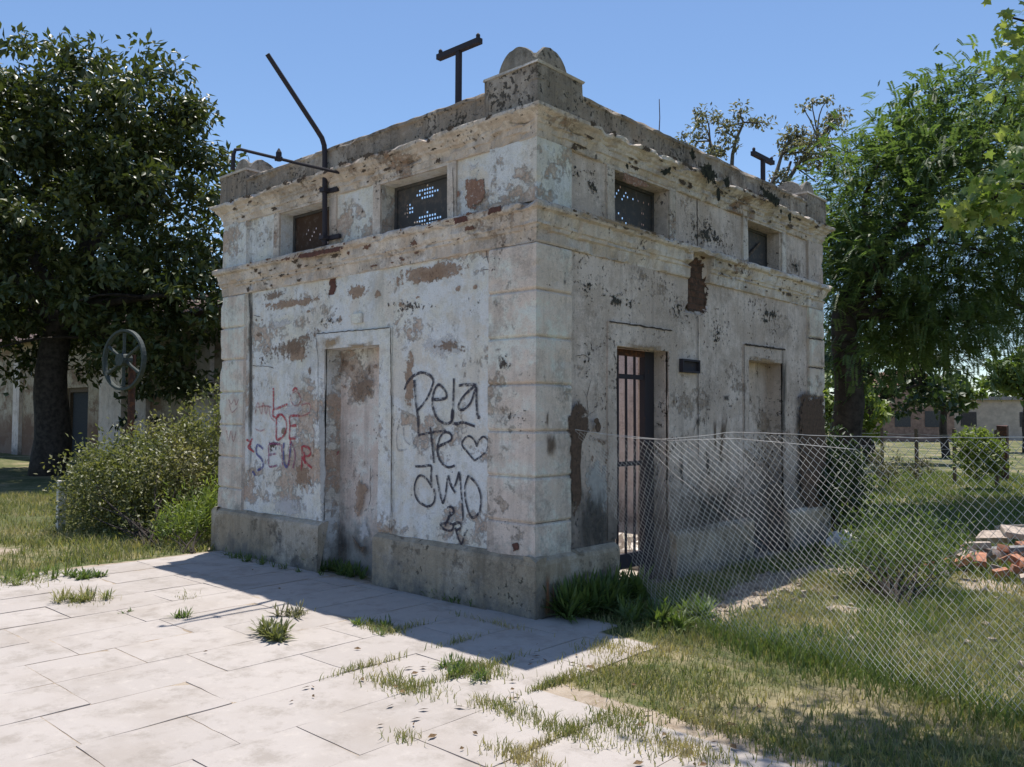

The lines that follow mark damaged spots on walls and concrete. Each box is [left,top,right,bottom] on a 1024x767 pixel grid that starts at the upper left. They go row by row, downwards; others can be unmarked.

peeling [247,242,349,375]
peeling [349,178,501,314]
spalling [651,215,811,342]
peeling [341,360,377,404]